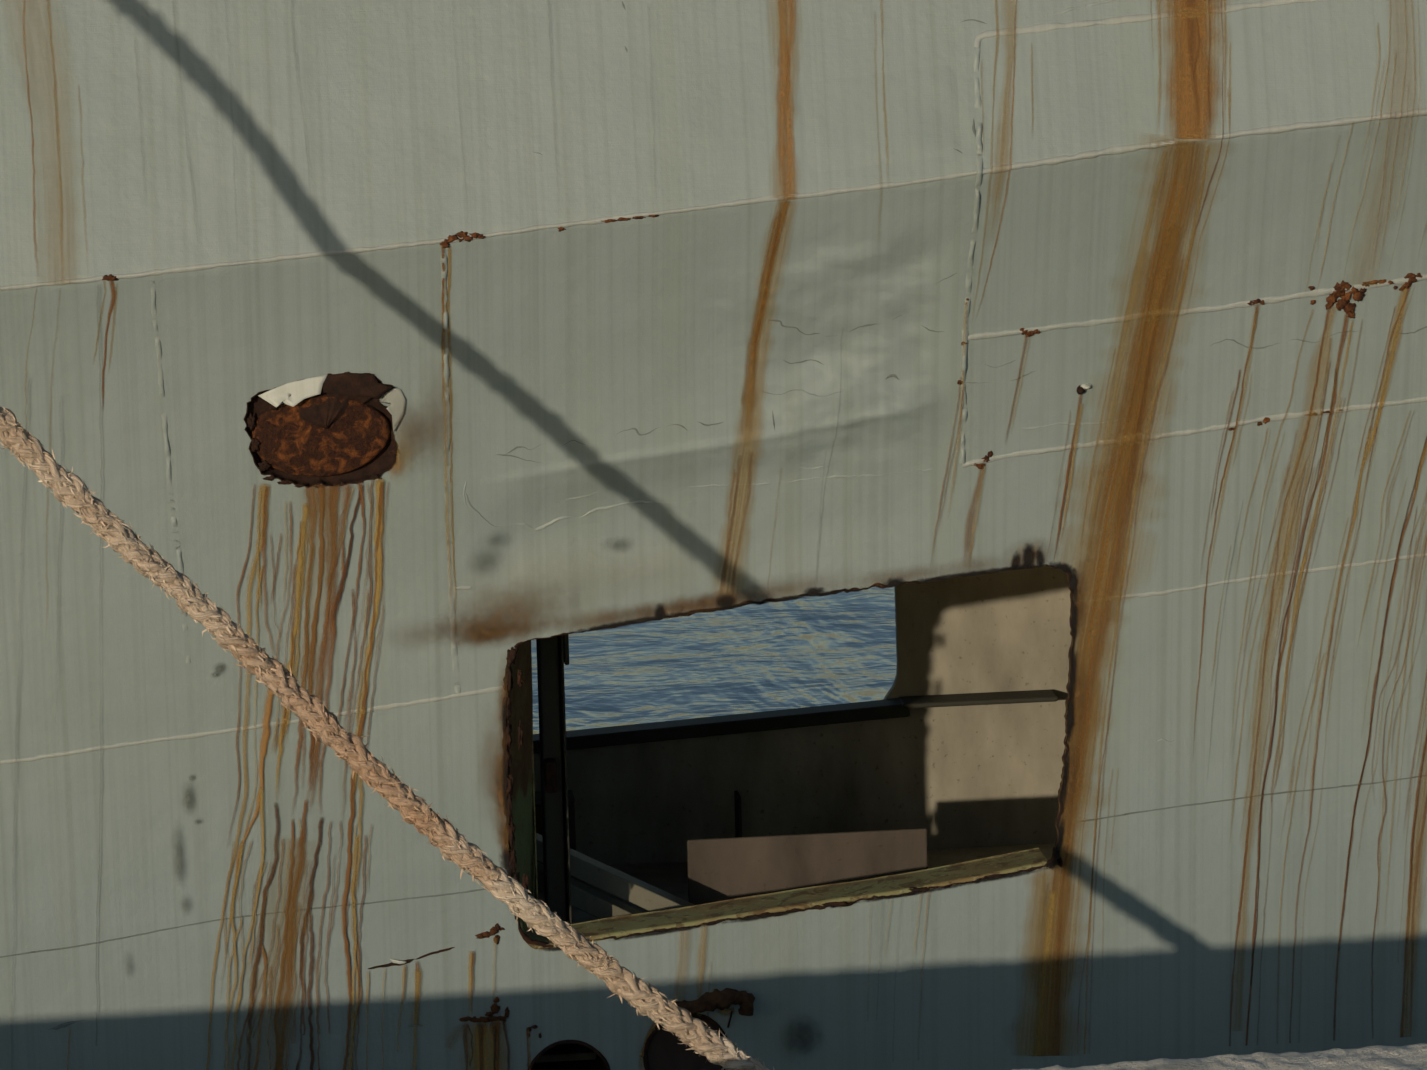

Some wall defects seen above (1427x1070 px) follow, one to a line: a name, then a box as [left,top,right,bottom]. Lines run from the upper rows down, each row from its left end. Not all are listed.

rust [236,479,384,748]
rust [440,231,485,580]
rust [720,0,794,599]
rust [1008,328,1040,428]
rust [1030,0,1226,1056]
rust [1195,299,1265,715]
rust [1229,273,1427,1046]
rust [206,661,384,1070]
rust [397,963,420,1070]
rust [459,923,510,1070]